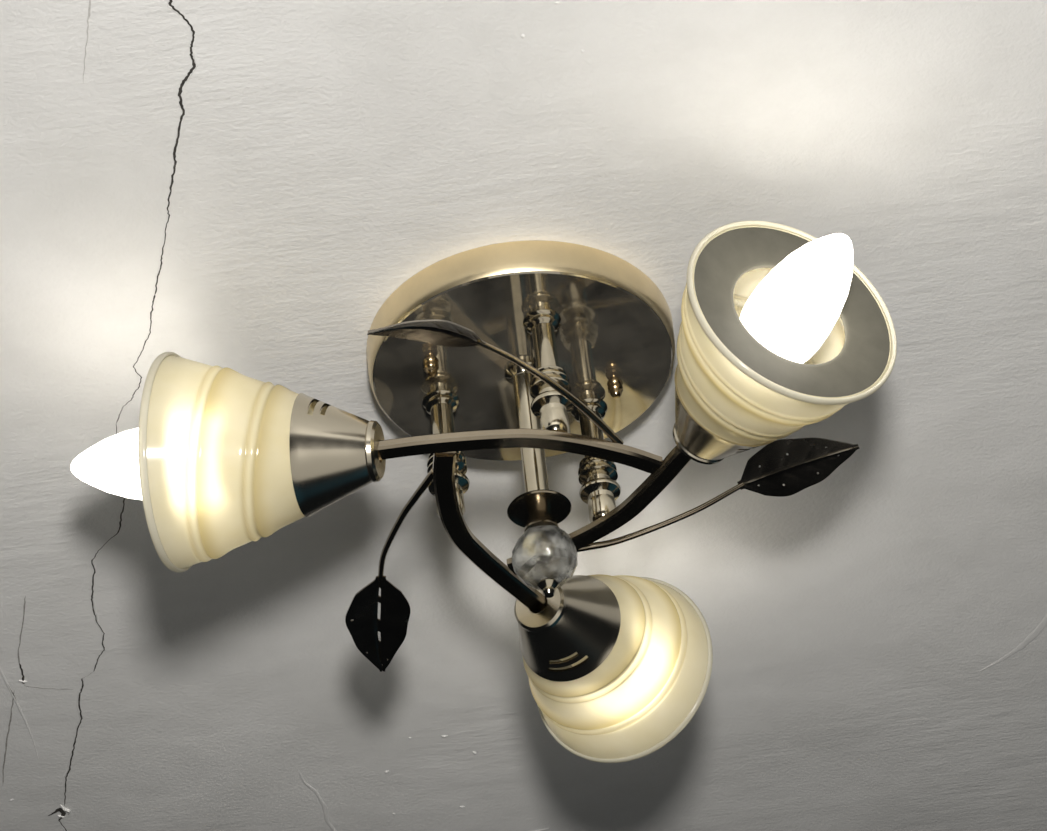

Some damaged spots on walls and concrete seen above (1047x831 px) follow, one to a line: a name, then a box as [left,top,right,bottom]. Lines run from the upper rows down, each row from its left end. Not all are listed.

crack [83,0,91,80]
crack [116,0,198,434]
crack [18,497,125,831]